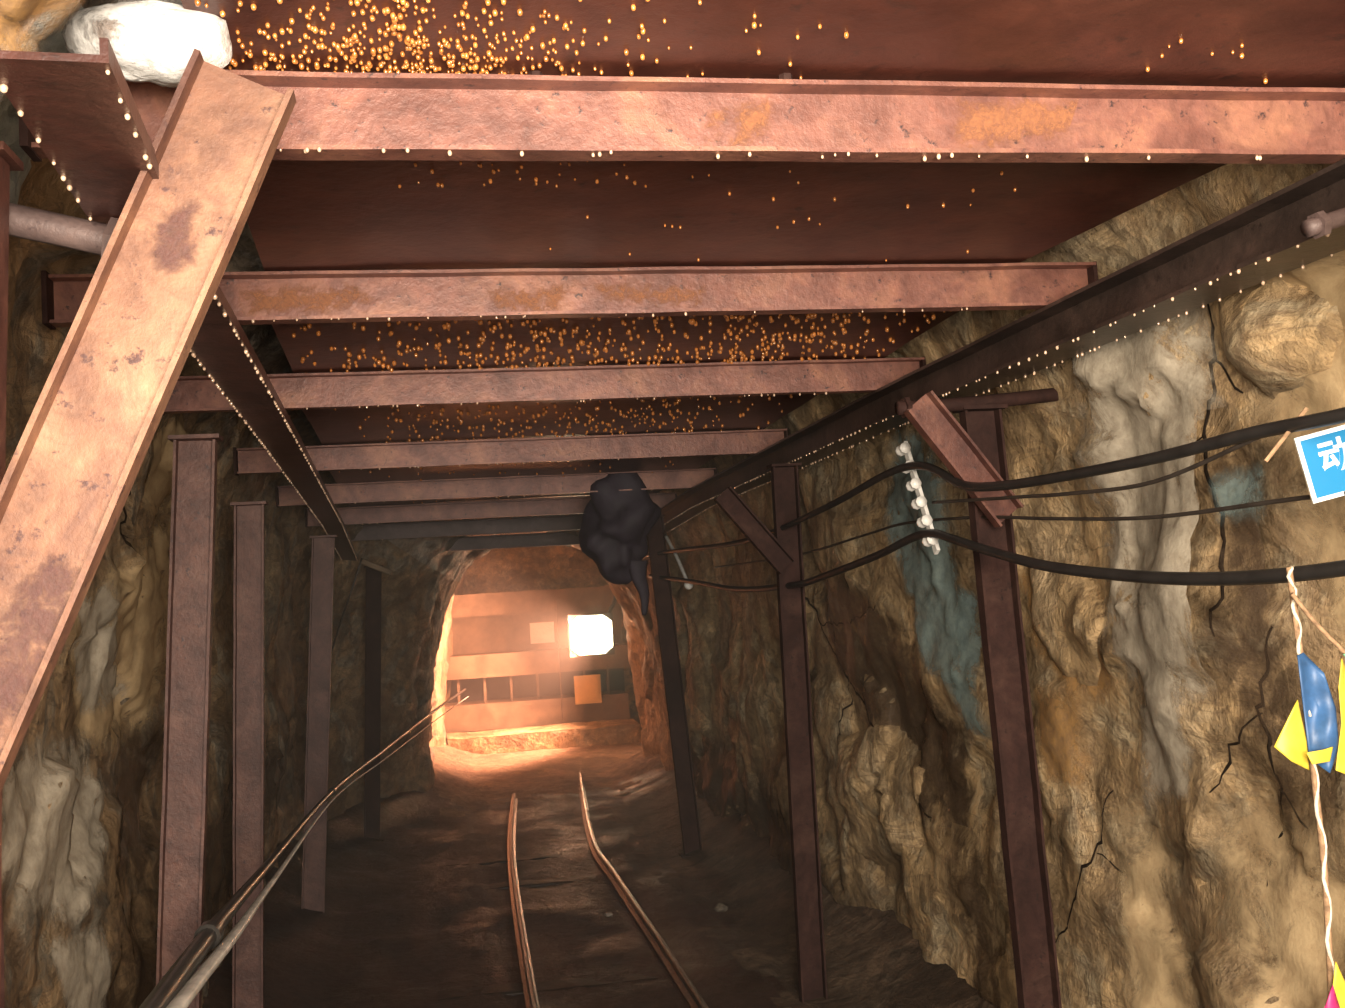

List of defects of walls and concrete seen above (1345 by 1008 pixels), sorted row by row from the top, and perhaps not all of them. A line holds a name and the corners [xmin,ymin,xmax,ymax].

rust [155,205,196,269]
rust [959,100,1077,146]
rust [0,413,187,758]
crack [1209,626,1308,886]